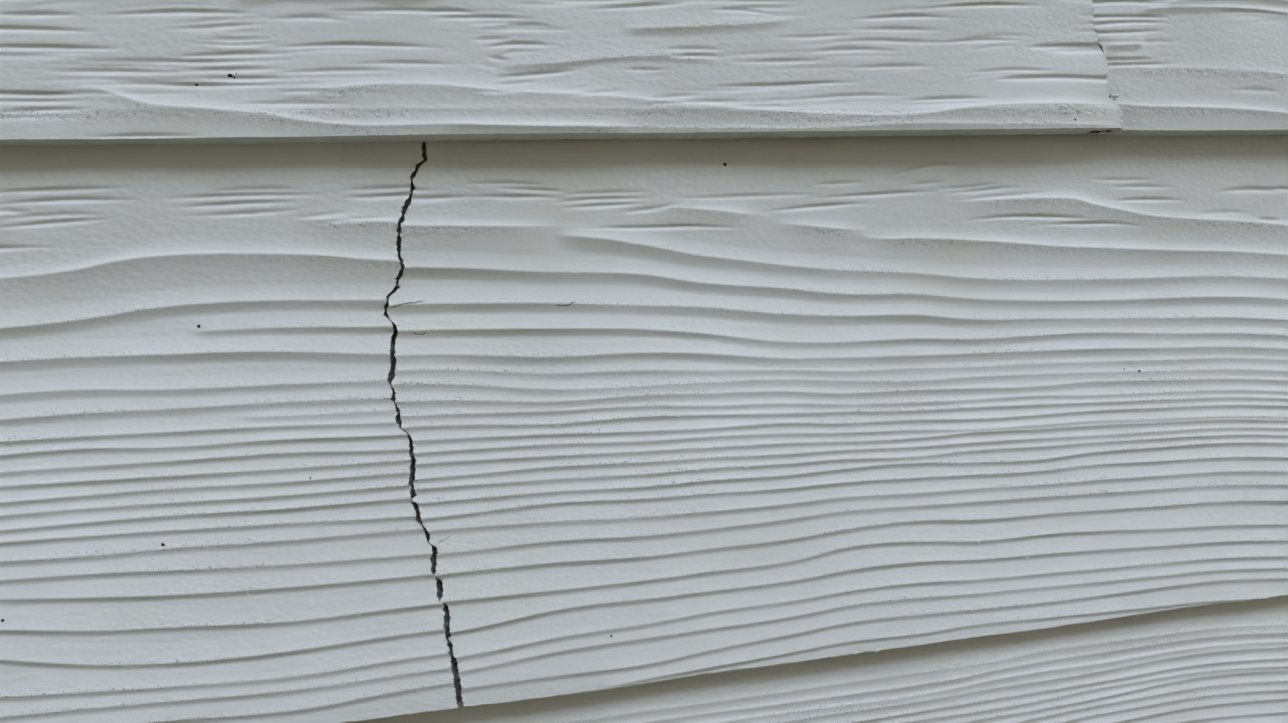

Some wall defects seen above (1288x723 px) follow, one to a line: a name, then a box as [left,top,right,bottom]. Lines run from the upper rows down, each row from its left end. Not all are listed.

crack [383,142,464,705]